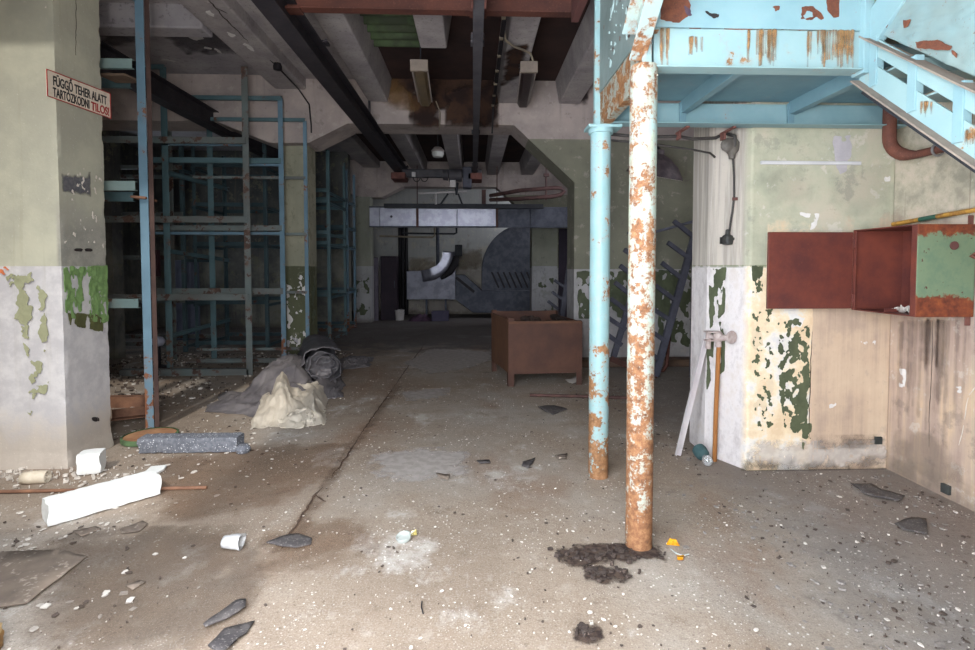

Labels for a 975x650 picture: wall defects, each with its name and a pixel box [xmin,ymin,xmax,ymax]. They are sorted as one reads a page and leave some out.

corrosion [660,0,701,65]
corrosion [724,28,784,66]
corrosion [799,0,854,68]
corrosion [915,40,957,58]
peeling [6,272,49,399]
peeling [63,265,109,333]
spalling [286,271,316,355]
peeling [706,267,726,389]
peeling [752,265,763,293]
peeling [751,309,812,450]
crack [281,348,422,549]